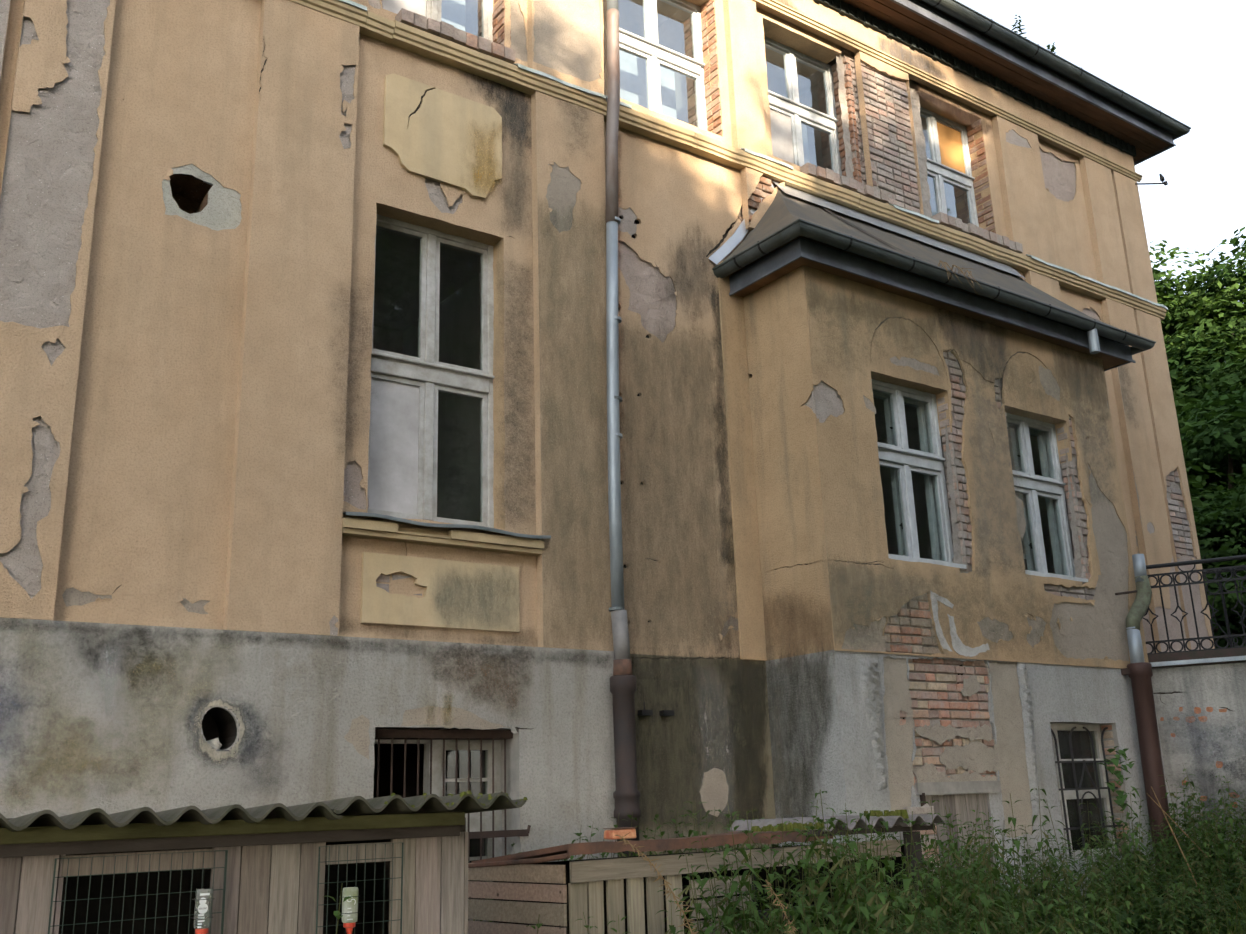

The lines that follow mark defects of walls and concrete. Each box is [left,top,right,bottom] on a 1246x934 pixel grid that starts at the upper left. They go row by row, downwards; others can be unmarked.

peeling [0,0,110,366]
peeling [162,164,242,231]
crack [409,89,432,117]
peeling [546,162,584,233]
peeling [618,216,679,343]
damp [640,239,735,568]
peeling [0,416,62,599]
peeling [1044,417,1211,661]
damp [73,628,170,686]
damp [189,699,267,763]
damp [631,582,831,827]
flaking render [883,593,1032,838]